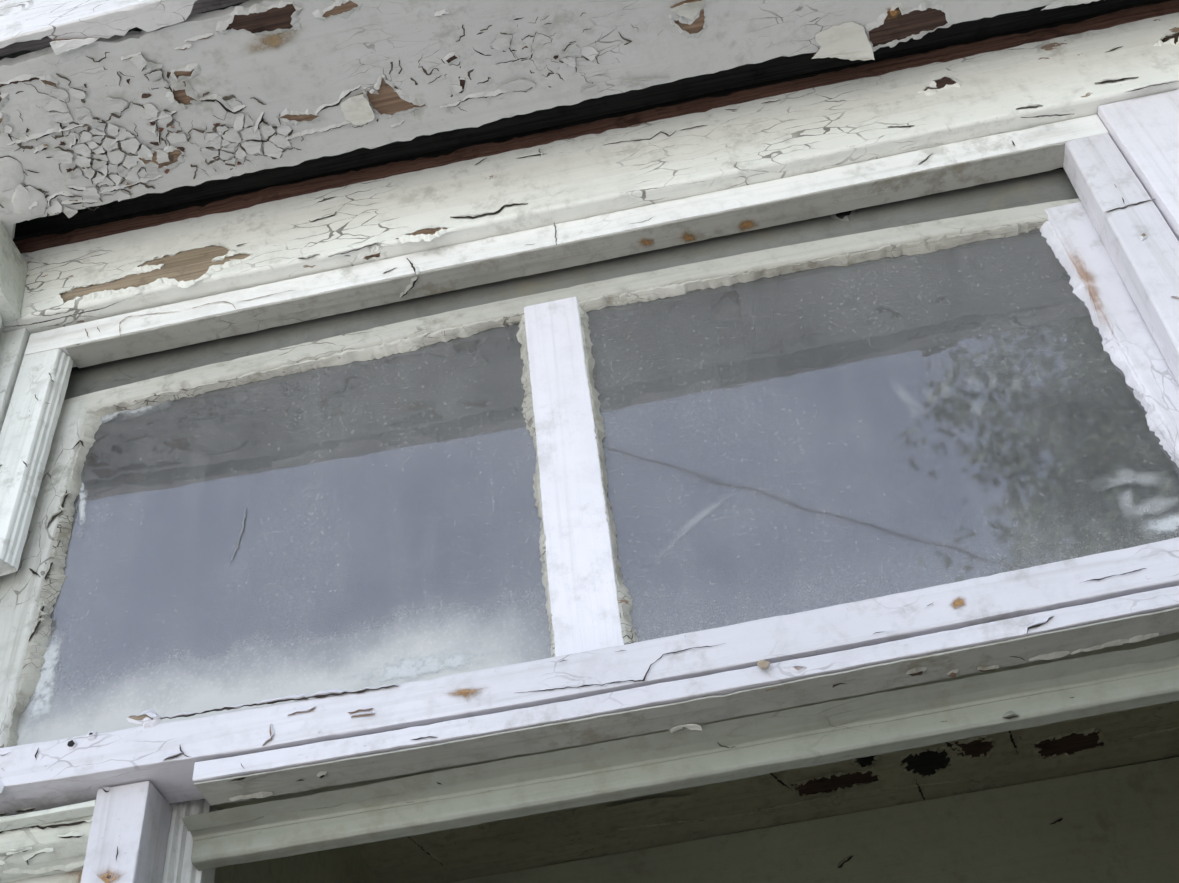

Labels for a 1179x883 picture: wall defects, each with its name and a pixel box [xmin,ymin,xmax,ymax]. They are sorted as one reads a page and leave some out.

peeling [50,37,100,55]
peeling [215,0,362,37]
peeling [669,0,708,39]
peeling [812,2,955,61]
peeling [1042,0,1099,10]
crack [0,9,663,222]
peeling [340,74,428,125]
peeling [918,75,963,96]
peeling [398,226,456,244]
peeling [56,242,253,305]
peeling [950,735,997,759]
crack [0,808,92,875]